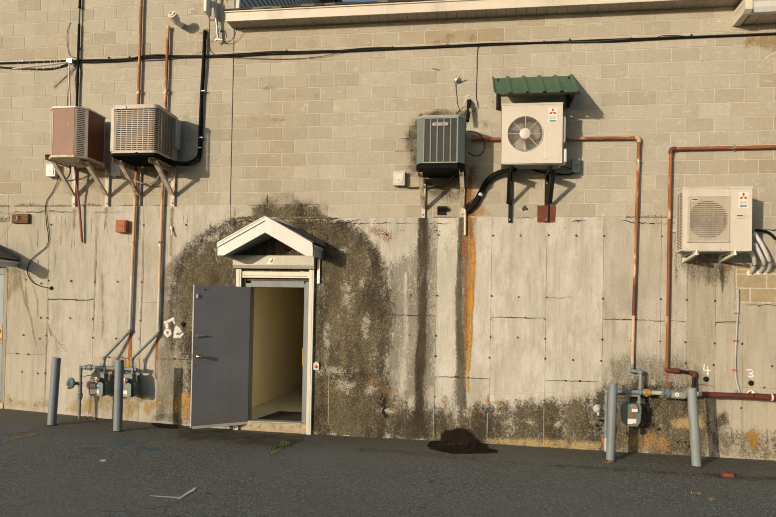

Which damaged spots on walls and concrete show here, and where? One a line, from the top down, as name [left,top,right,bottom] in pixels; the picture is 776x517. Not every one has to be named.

leakage [69,200,608,451]
corrosion [461,166,483,392]
leakage [612,357,776,458]
leakage [675,256,730,293]